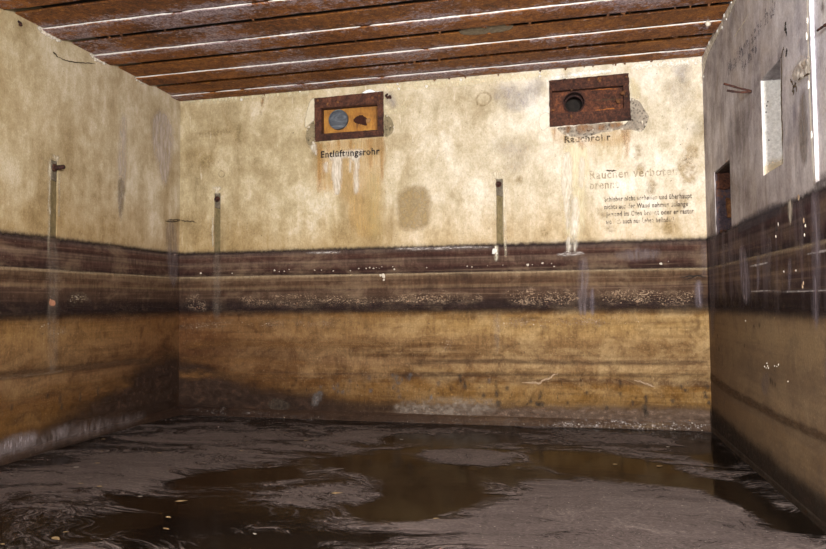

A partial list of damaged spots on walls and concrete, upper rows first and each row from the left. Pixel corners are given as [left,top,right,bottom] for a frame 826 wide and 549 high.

leakage [0,0,826,318]
spalling [539,98,649,137]
leakage [0,357,339,454]